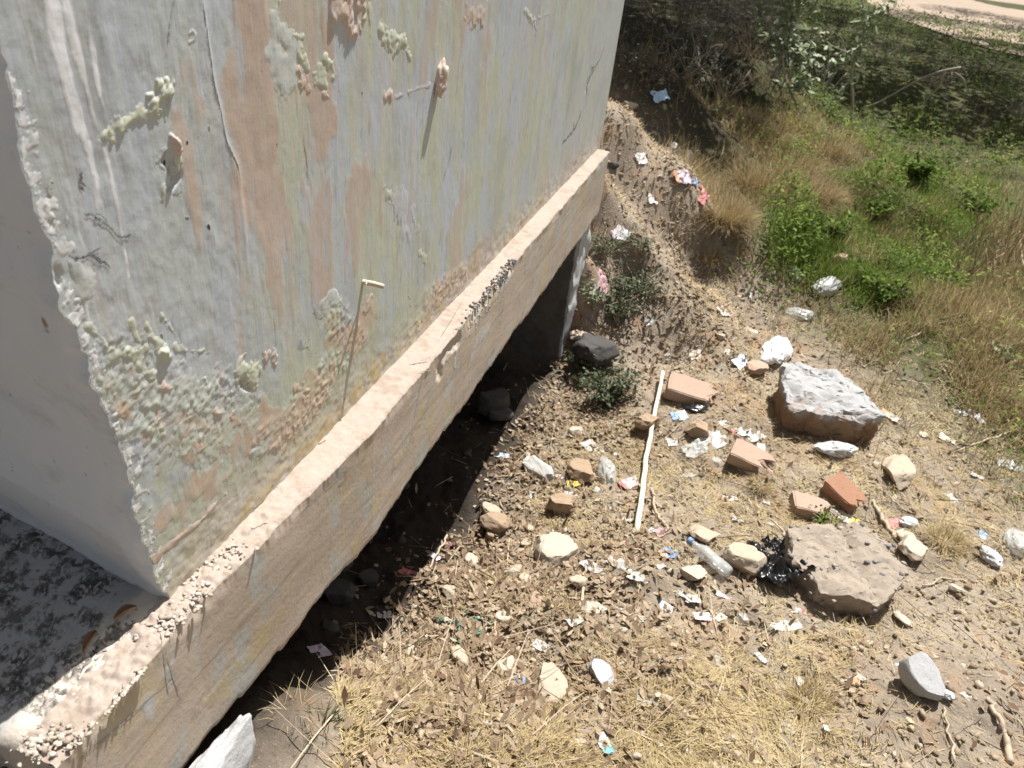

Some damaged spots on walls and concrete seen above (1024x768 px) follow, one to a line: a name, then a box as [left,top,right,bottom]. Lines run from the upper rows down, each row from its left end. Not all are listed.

crack [204,6,242,185]
crack [562,48,604,144]
peeling [7,71,262,647]
spalling [445,258,517,372]